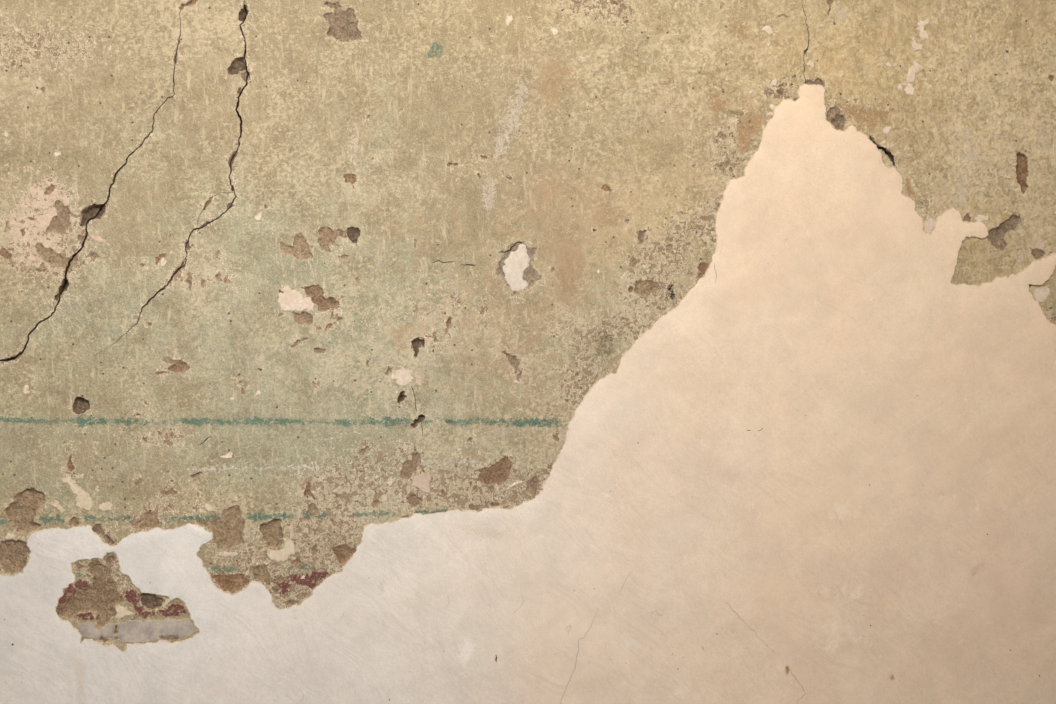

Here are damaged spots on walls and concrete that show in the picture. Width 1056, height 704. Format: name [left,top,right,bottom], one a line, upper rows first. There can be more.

spalling [322,1,364,42]
crack [0,11,181,363]
crack [94,0,251,356]
peeling [0,174,110,274]
peeling [279,226,361,260]
peeling [495,241,555,296]
peeling [277,284,346,354]
peeling [468,455,513,511]
spalling [0,487,47,576]
peeling [192,491,246,550]
peeling [62,516,127,644]
peeling [211,565,309,607]